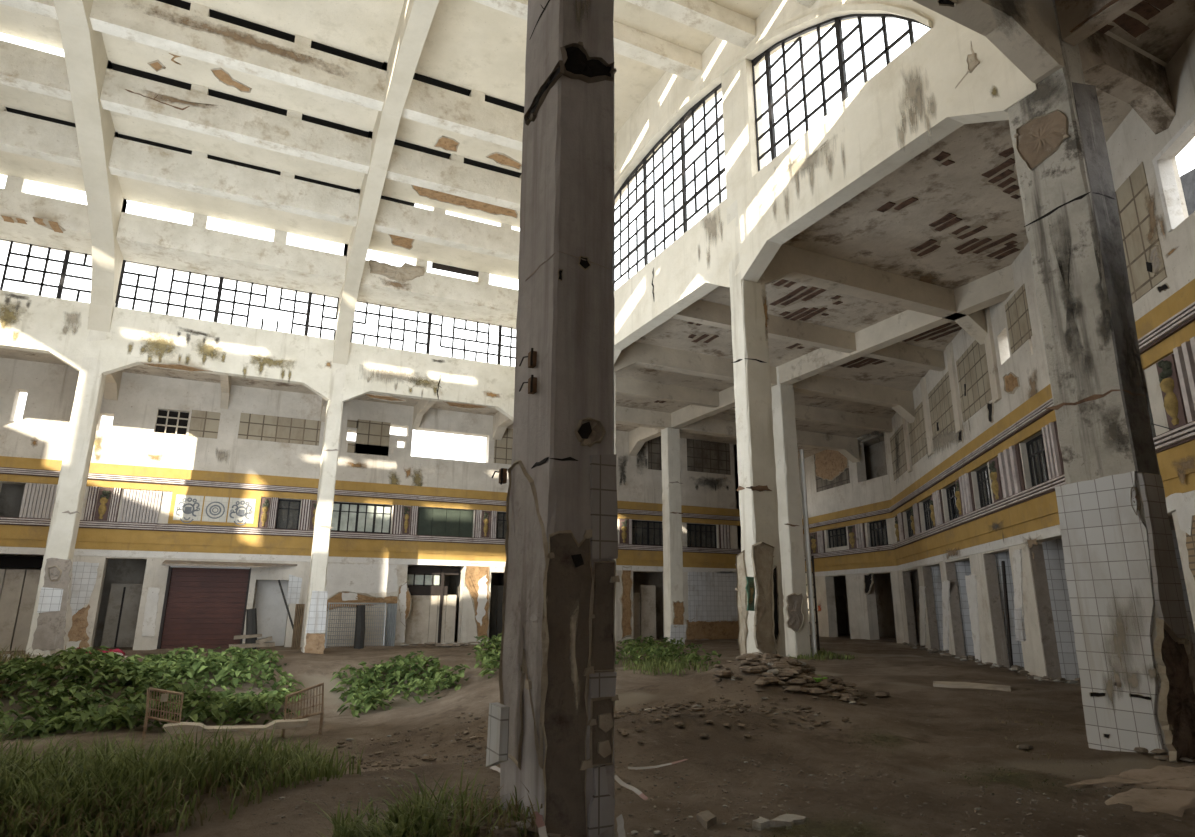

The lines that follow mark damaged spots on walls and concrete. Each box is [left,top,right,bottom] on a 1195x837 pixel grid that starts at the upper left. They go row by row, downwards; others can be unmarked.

spalling [147,53,181,72]
peeling [150,92,214,106]
spalling [211,67,252,93]
spalling [524,41,617,126]
spalling [1070,0,1176,40]
spalling [981,109,1069,201]
leakage [1058,250,1092,369]
leakage [1094,244,1148,396]
leakage [1029,372,1037,398]
spalling [735,541,804,656]
spalling [463,460,597,837]
spalling [1065,618,1195,817]